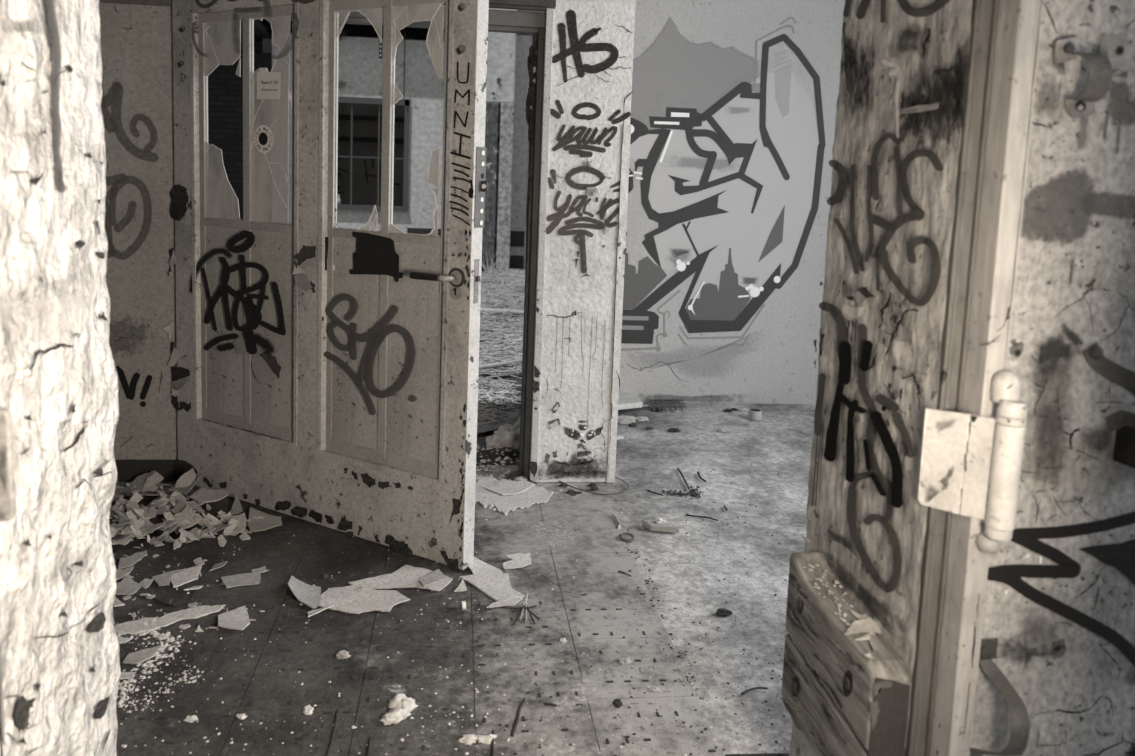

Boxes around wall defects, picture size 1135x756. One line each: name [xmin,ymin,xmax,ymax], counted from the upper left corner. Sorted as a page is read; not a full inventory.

peeling [173,459,227,489]
peeling [344,468,413,490]
peeling [448,498,460,524]
peeling [275,501,413,557]
peeling [440,550,459,572]
spalling [87,611,106,633]
spalling [6,682,44,745]
spalling [92,696,111,754]